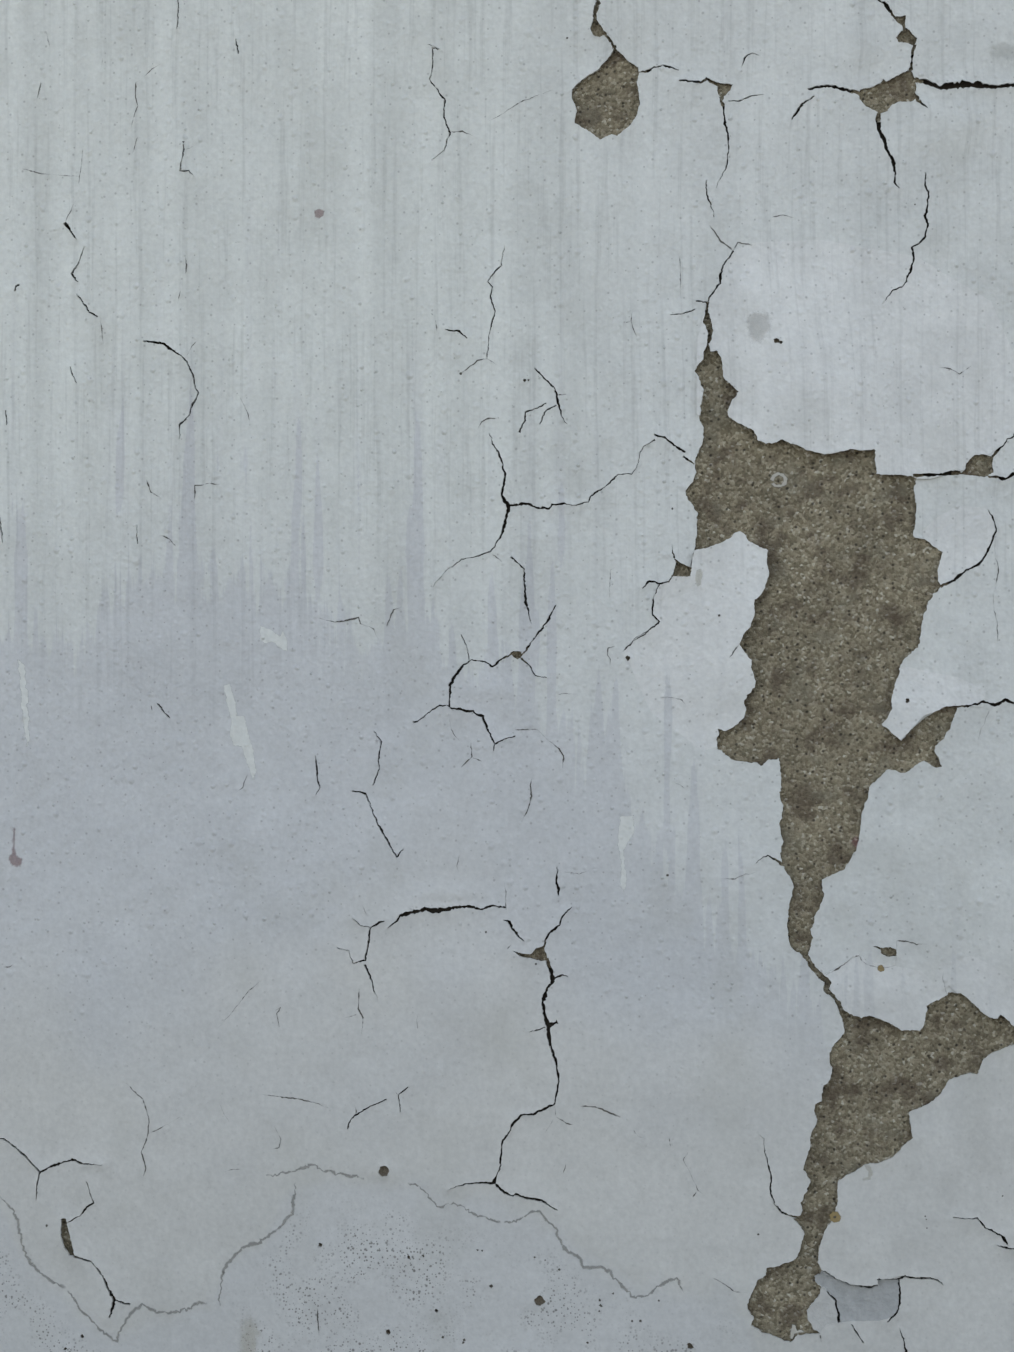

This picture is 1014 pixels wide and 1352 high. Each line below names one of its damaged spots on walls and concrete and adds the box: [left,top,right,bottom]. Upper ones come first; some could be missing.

crack [590,0,613,44]
peeling [572,42,647,139]
peeling [792,0,1014,188]
crack [647,53,758,315]
crack [885,174,930,301]
crack [146,341,199,428]
crack [414,369,688,765]
crack [948,510,999,637]
crack [965,698,1014,708]
peeling [624,240,1014,1342]
crack [339,871,616,1210]
crack [0,1138,94,1193]